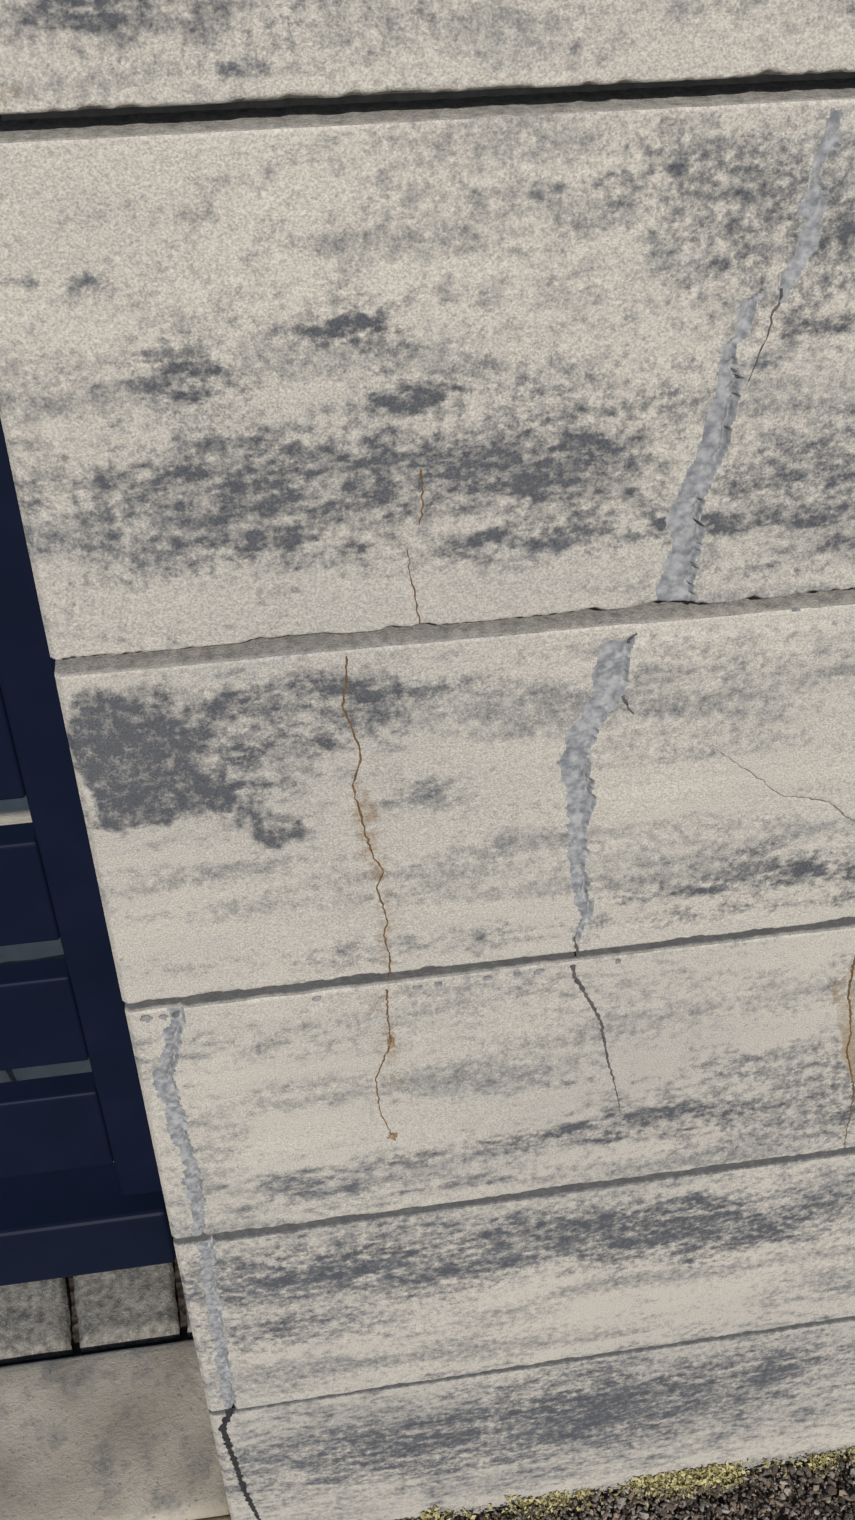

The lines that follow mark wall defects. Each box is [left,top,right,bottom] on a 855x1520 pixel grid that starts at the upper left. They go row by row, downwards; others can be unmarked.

water stain [723,50,775,78]
water stain [793,65,831,75]
crack [407,469,424,624]
water stain [1,99,855,882]
crack [656,108,844,603]
crack [341,656,396,1141]
corrosion [339,738,413,1107]
crack [557,633,638,1114]
crack [718,750,855,822]
corrosion [829,963,855,1081]
crack [844,958,855,1148]
crack [152,1006,261,1520]